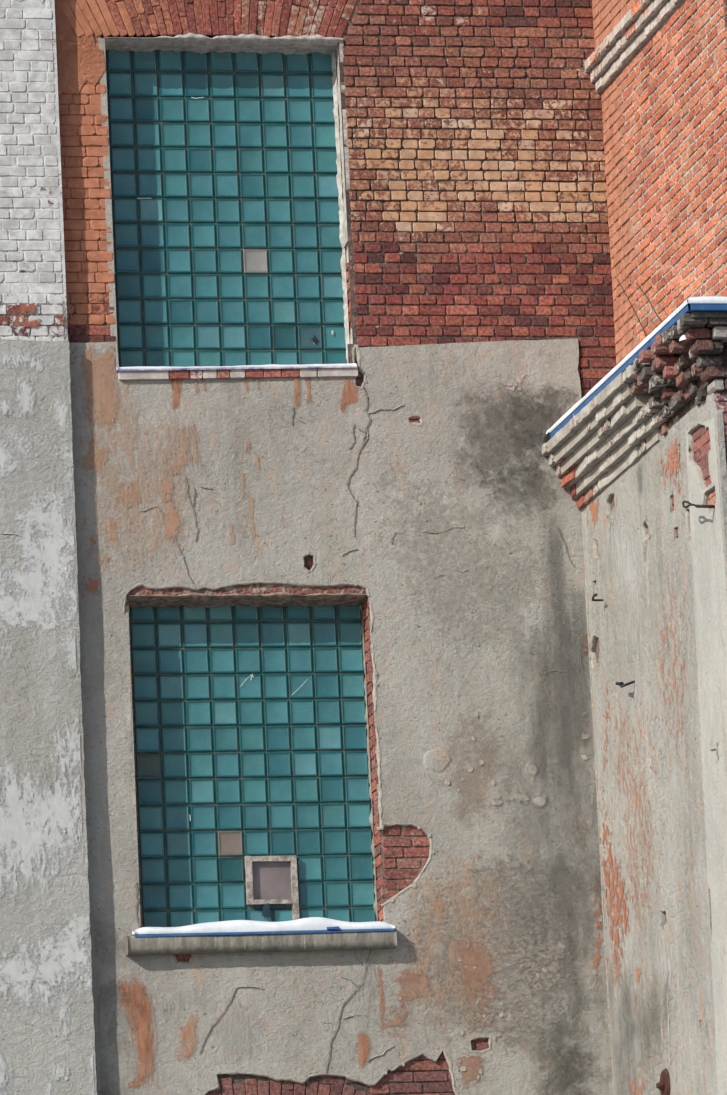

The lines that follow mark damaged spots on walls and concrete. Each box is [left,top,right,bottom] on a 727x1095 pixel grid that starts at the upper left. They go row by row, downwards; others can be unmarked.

peeling [0,352,43,416]
peeling [76,345,119,431]
peeling [0,399,111,671]
crack [342,387,403,556]
damp [465,393,562,509]
flaking render [660,422,716,539]
peeling [0,718,83,901]
peeling [0,911,92,1040]
crack [199,986,263,1054]
crack [326,949,372,1073]